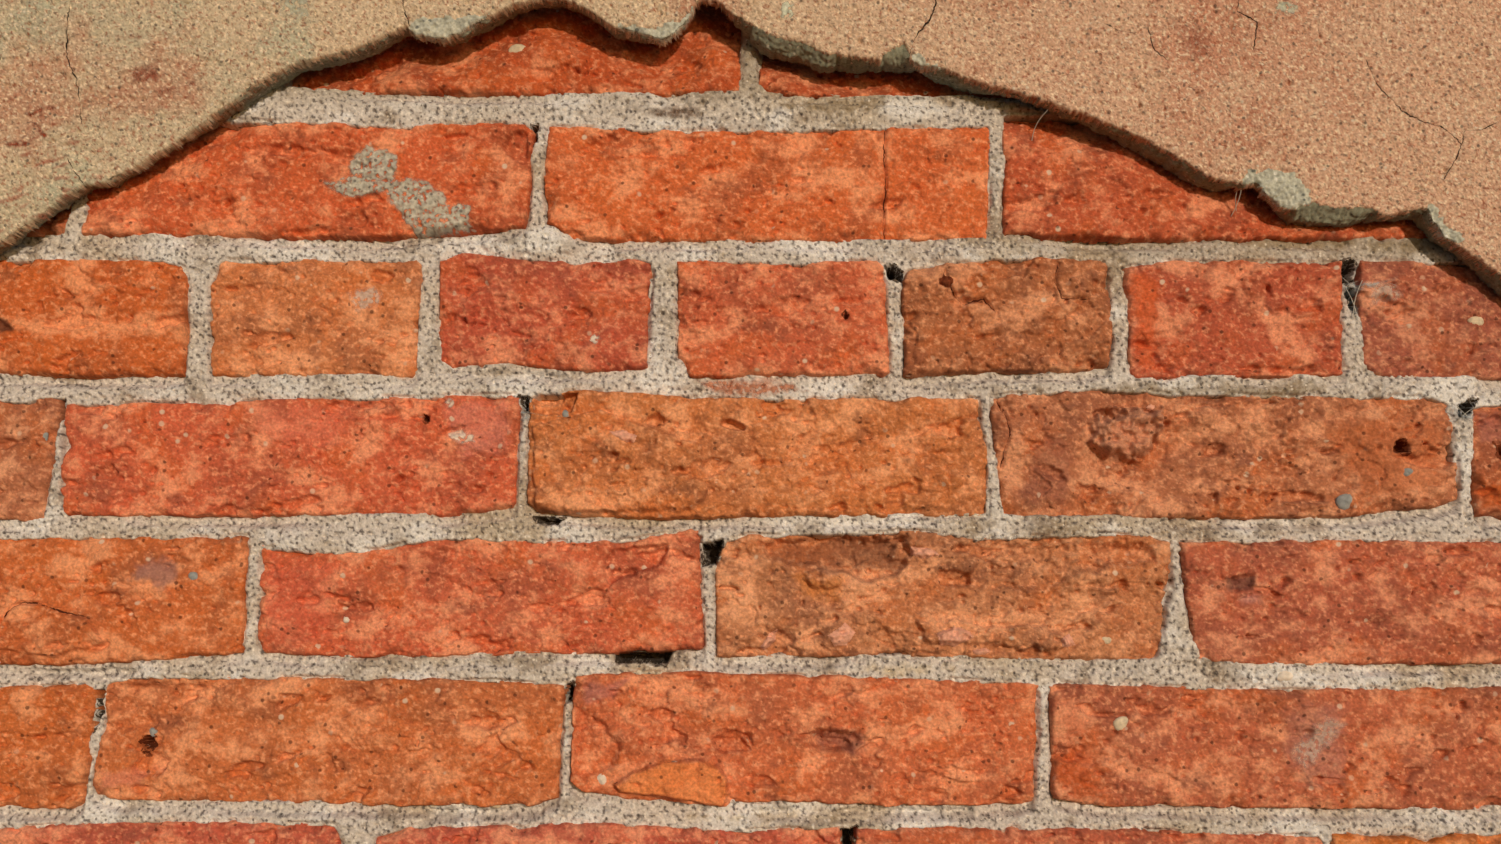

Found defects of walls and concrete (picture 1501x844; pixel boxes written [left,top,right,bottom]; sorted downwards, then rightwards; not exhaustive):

crack [65,0,82,124]
crack [909,0,937,54]
spalling [0,0,1501,297]